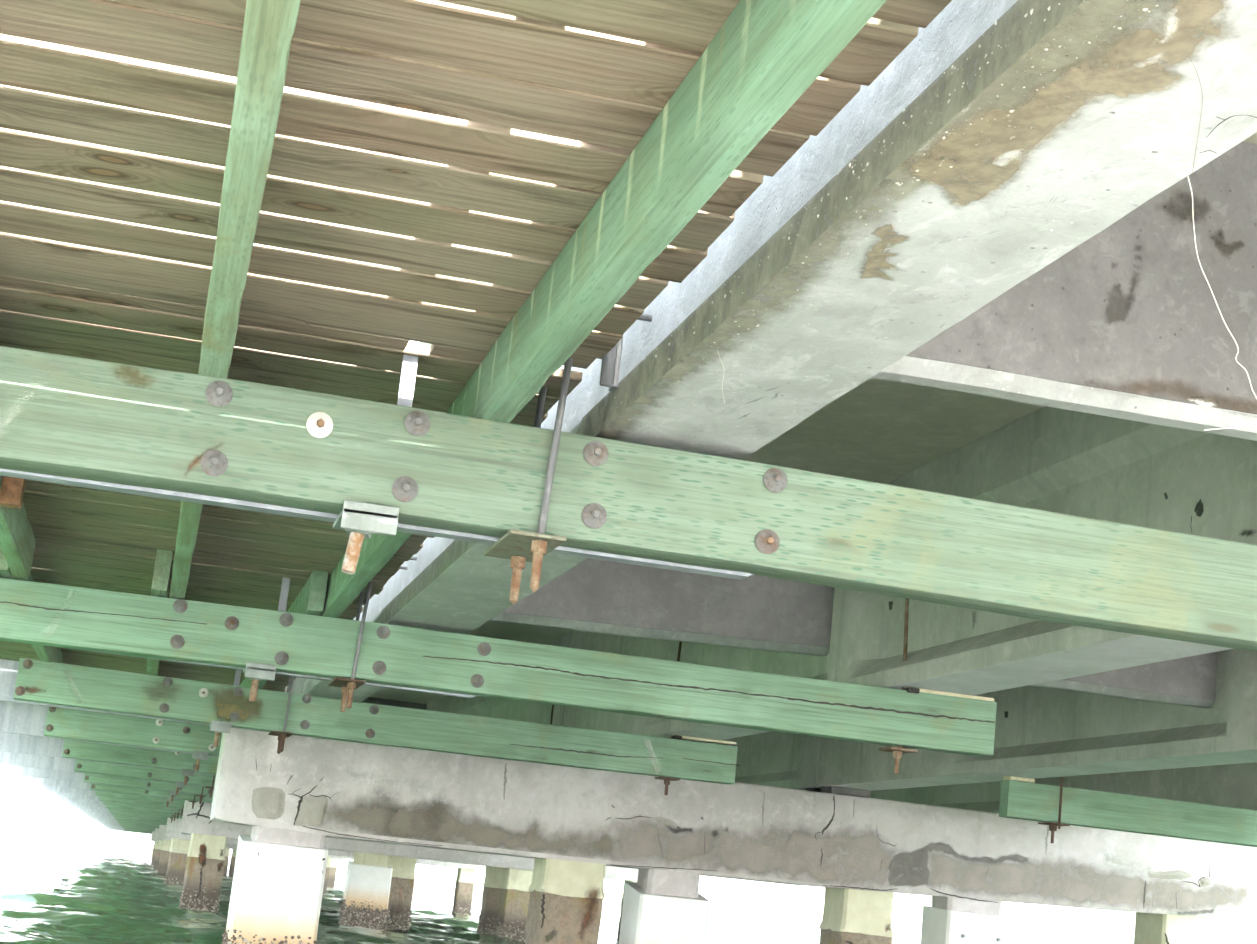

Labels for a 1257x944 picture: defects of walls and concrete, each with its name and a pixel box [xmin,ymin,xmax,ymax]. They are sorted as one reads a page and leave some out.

damp [908,0,1226,206]
damp [860,224,909,280]
damp [1211,231,1243,256]
damp [1107,277,1136,322]
crack [256,763,443,846]
rust [199,844,223,871]
rust [579,890,598,939]
damp [327,798,1248,914]
crack [815,795,897,891]
crack [930,860,998,903]
crack [1143,866,1210,944]